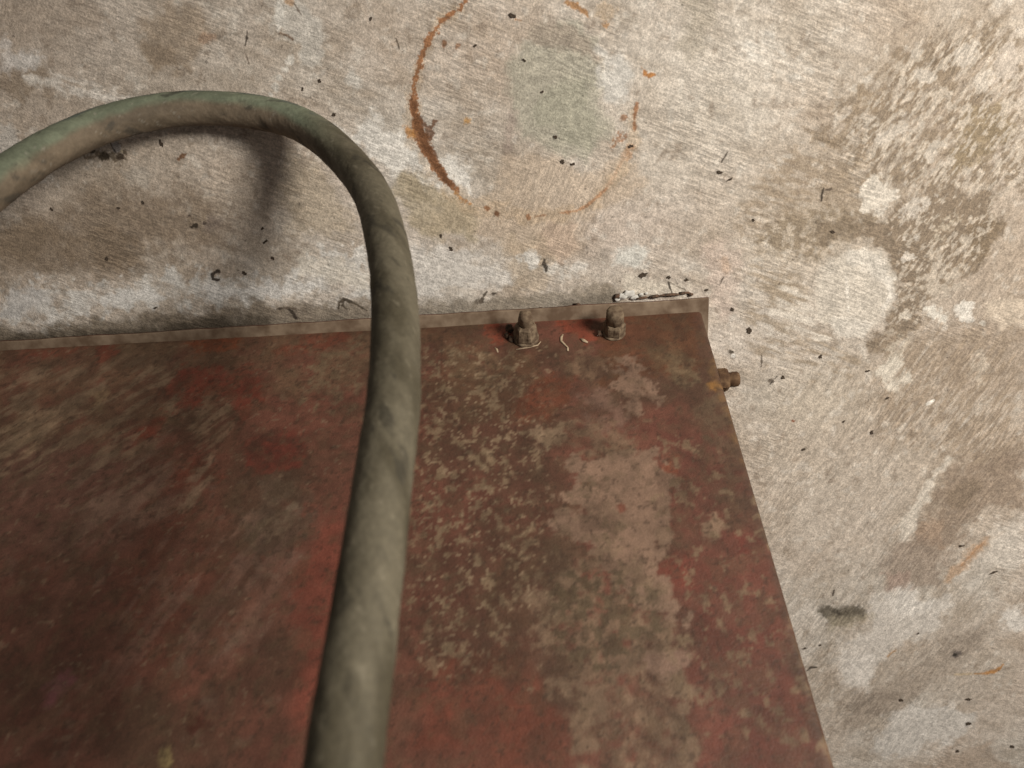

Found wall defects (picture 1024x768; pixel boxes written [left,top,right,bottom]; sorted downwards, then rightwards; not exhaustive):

corrosion [400,0,644,229]
water stain [695,202,881,324]